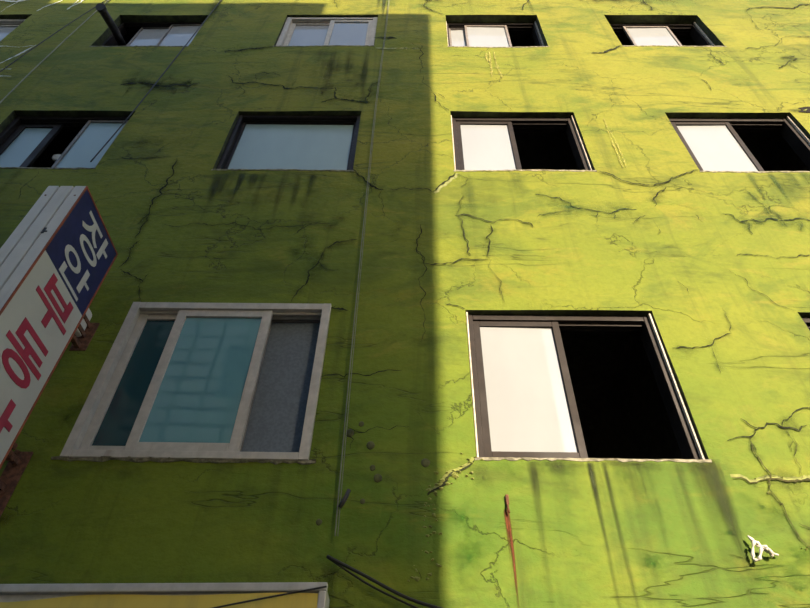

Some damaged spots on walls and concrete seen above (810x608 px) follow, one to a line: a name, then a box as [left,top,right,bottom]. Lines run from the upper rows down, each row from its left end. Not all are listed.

crack [119,156,324,302]
crack [353,169,698,341]
crack [729,254,795,311]
crack [725,192,810,234]
crack [674,315,731,373]
leakage [588,462,601,516]
leakage [699,463,738,540]
crack [727,407,810,550]
rust [504,494,518,596]